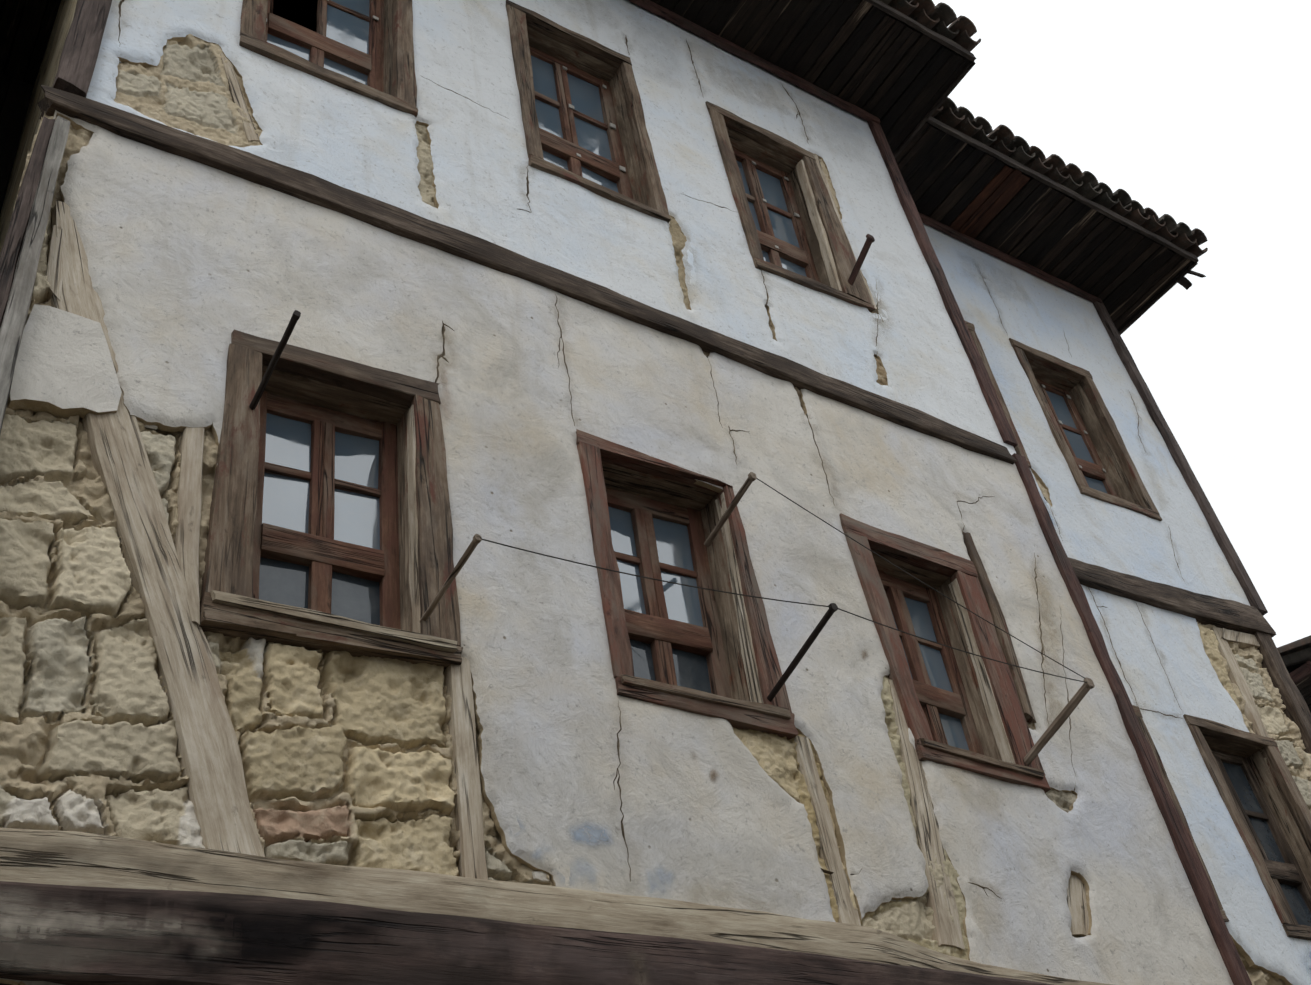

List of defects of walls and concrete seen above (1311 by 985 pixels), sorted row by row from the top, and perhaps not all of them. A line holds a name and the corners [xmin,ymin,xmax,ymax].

spalling [14,112,92,328]
crack [117,0,125,47]
spalling [114,34,262,147]
spalling [415,123,437,208]
spalling [669,216,689,309]
crack [555,297,575,426]
spalling [0,405,205,849]
spalling [204,631,460,876]
spalling [480,781,553,886]
crack [613,700,631,880]
spalling [732,676,968,960]
spalling [1197,622,1311,812]